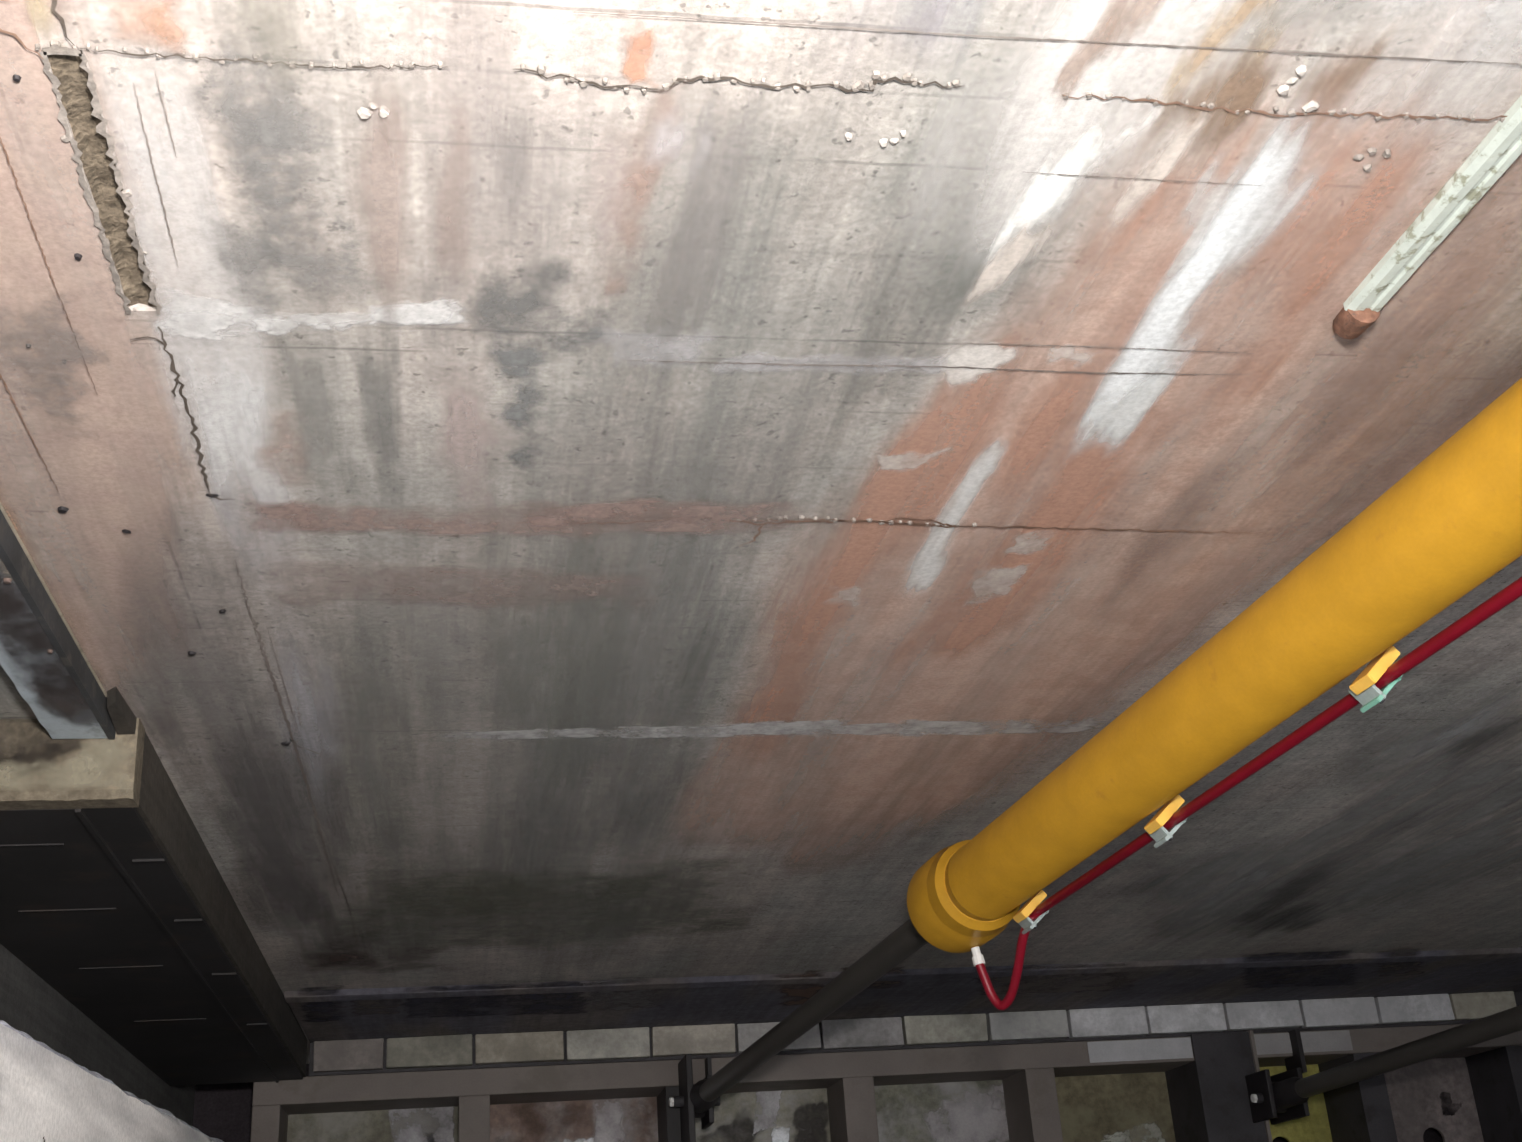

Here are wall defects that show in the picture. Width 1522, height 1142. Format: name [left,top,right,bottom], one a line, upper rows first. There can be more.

rust [0,0,69,179]
rust [0,123,177,689]
spalling [35,40,162,315]
crack [130,327,235,500]
crack [0,0,448,266]
leakage [158,266,568,508]
crack [513,63,965,94]
efflorescence [909,444,999,588]
efflorescence [918,345,1015,384]
crack [579,12,1518,64]
rust [711,168,1518,860]
efflorescence [1081,133,1306,441]